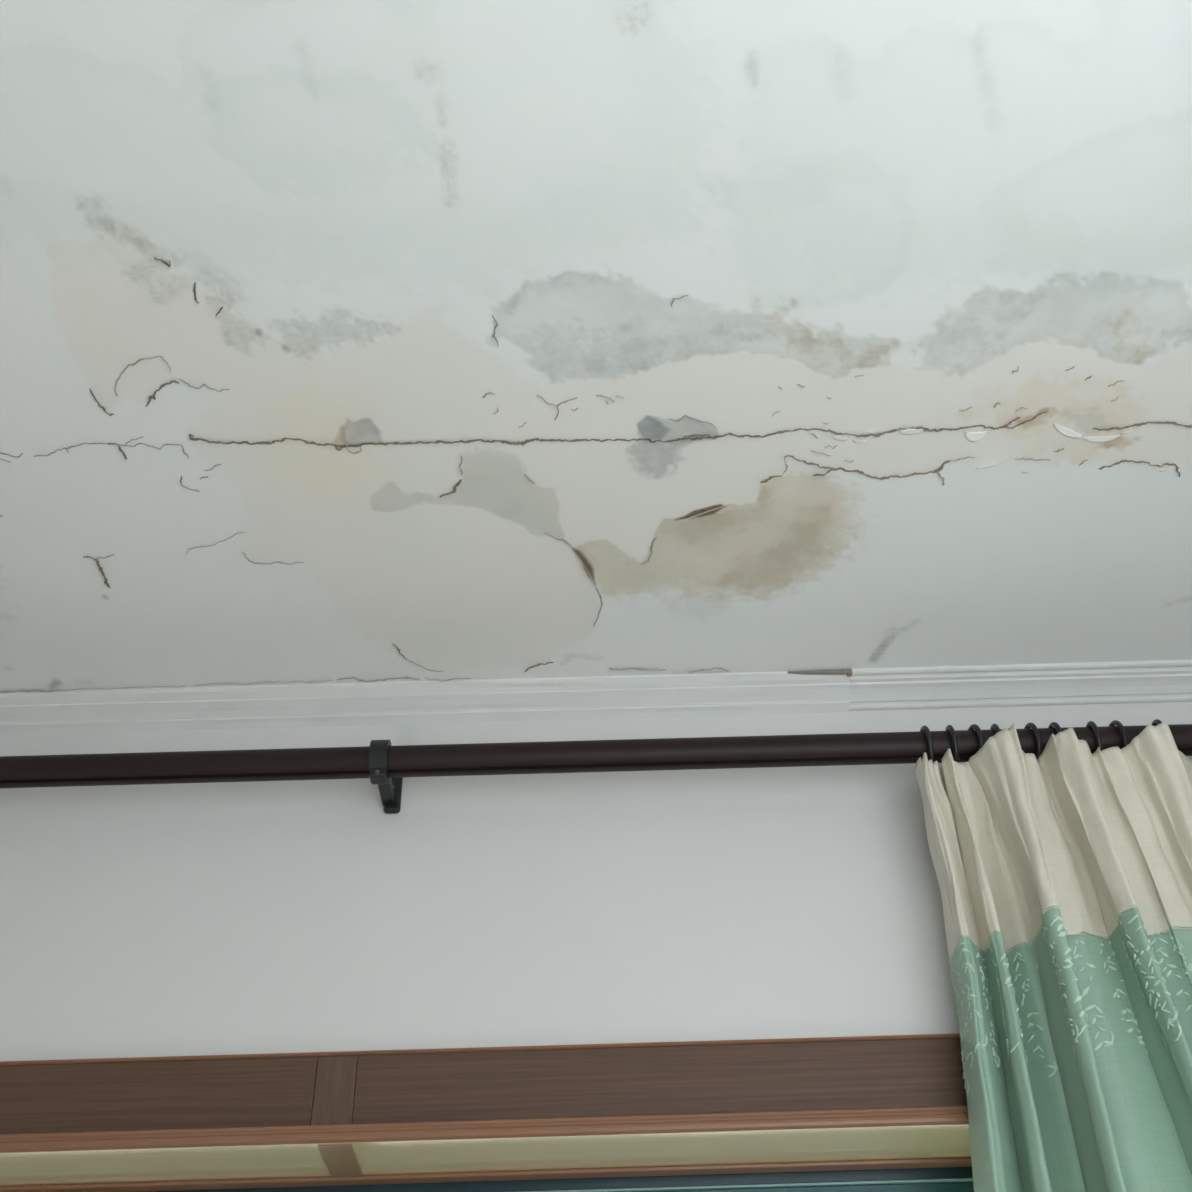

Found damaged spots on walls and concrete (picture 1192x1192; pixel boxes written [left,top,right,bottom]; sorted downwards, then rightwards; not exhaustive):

crack [0,395,1192,486]